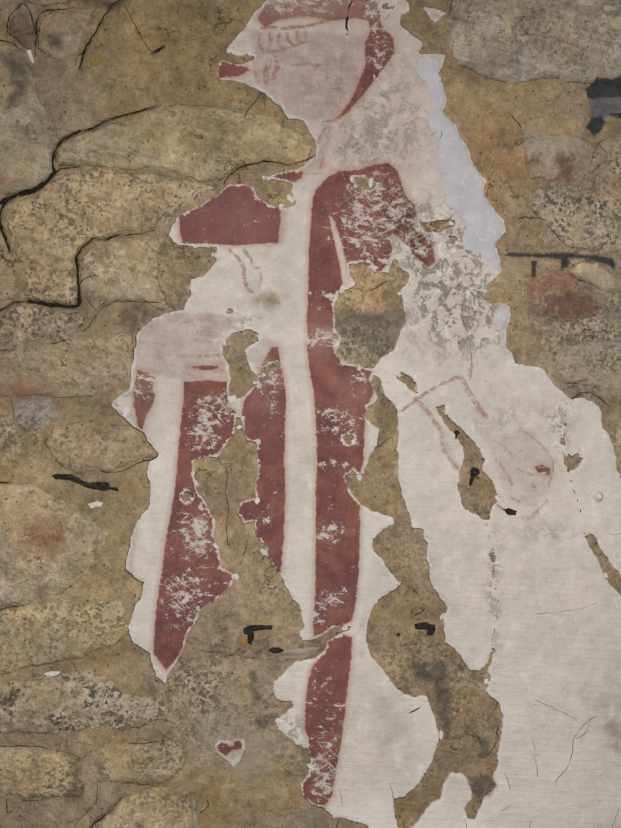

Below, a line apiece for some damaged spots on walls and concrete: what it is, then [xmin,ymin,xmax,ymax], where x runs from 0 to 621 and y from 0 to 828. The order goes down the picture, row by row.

crack [76,0,164,68]
crack [0,106,157,262]
crack [224,156,313,184]
flaking render [421,219,457,244]
crack [0,230,157,333]
flaking render [222,329,280,402]
flaking render [560,438,585,472]
flaking render [334,259,502,828]
flaking render [583,532,621,595]
crack [75,783,155,828]